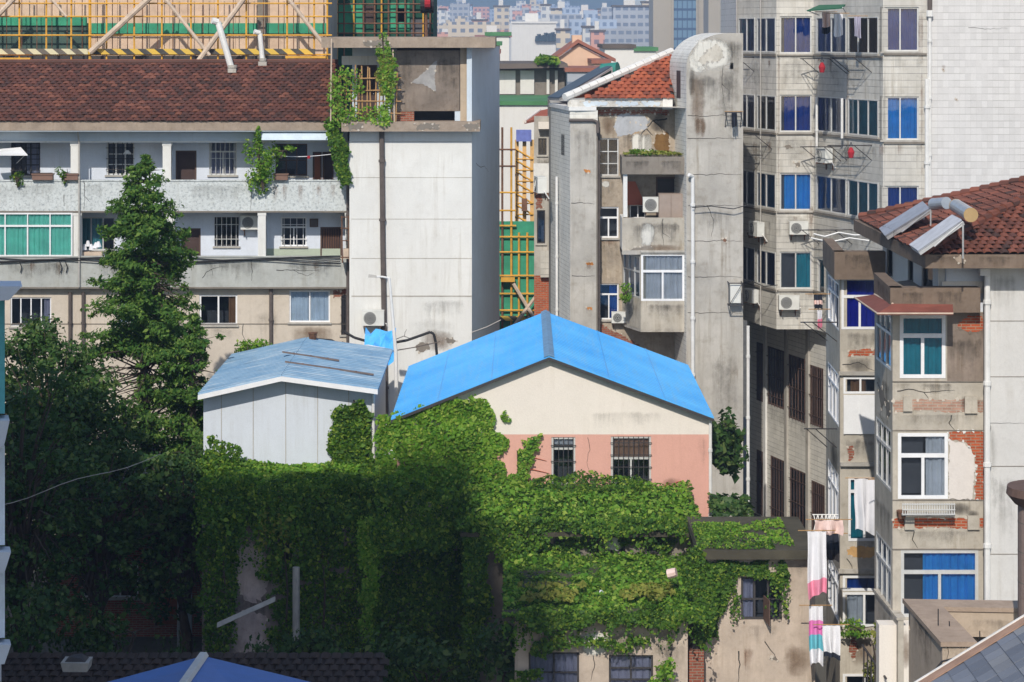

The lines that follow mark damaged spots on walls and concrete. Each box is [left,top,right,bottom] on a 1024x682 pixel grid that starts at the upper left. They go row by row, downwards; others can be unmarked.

flaking render [958,315,983,334]
flaking render [847,347,875,358]
crack [842,362,954,429]
flaking render [878,385,965,419]
flaking render [947,429,983,501]
flaking render [892,516,967,530]